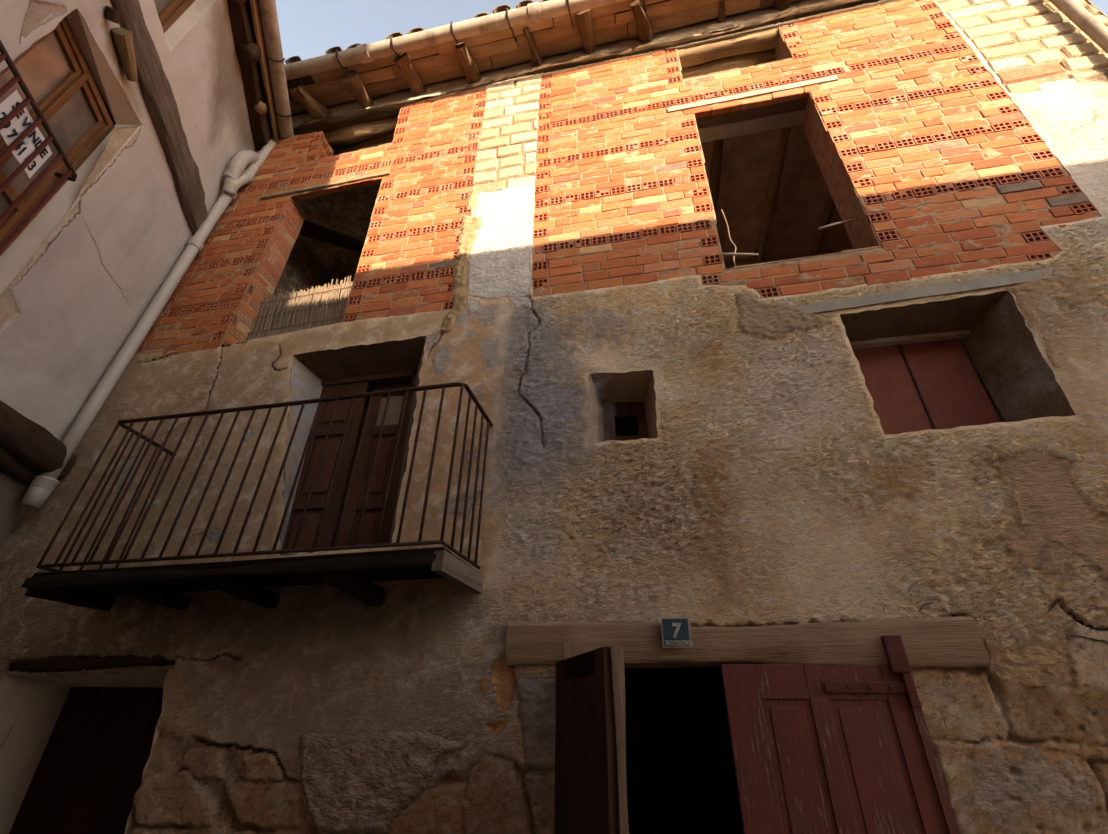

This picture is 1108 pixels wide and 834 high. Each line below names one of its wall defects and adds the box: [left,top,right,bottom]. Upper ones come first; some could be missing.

crack [515,303,541,429]
crack [1048,600,1108,644]
flaking render [480,657,517,734]